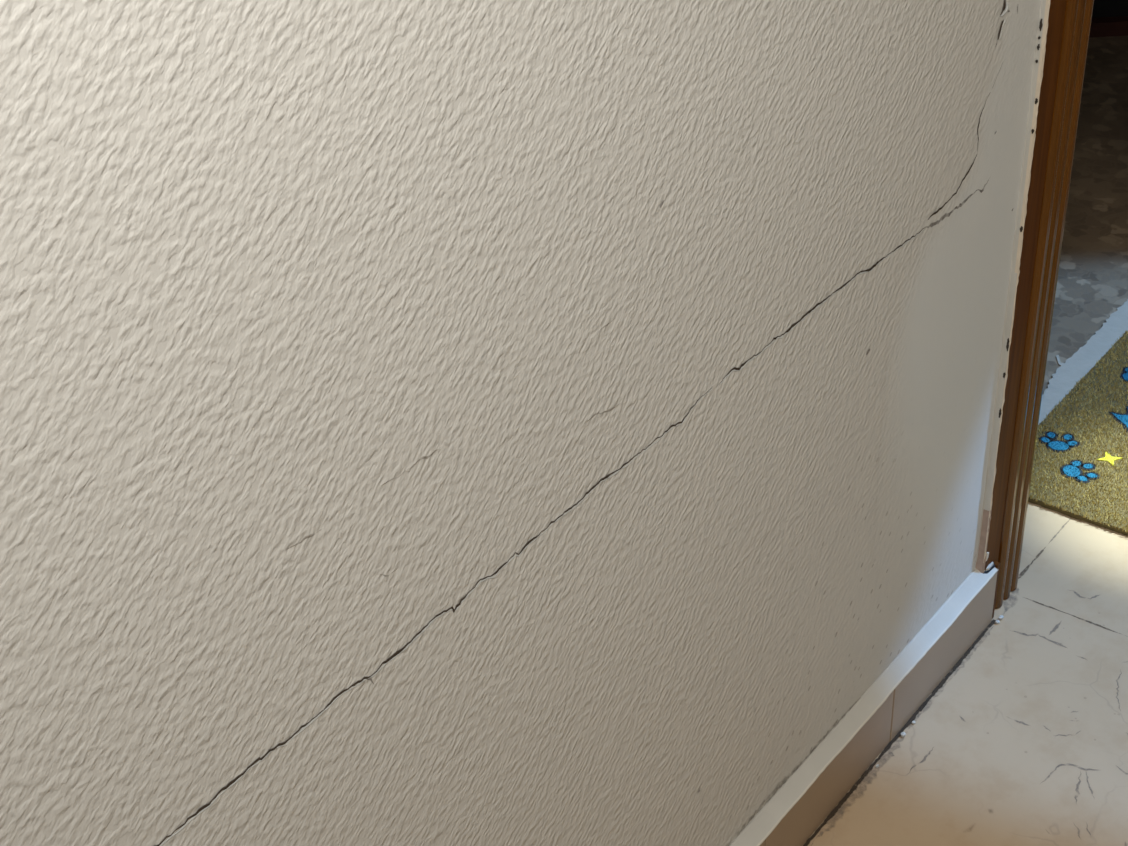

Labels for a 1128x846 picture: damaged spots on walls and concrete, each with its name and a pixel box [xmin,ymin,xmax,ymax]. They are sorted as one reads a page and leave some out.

crack [155,93,990,846]